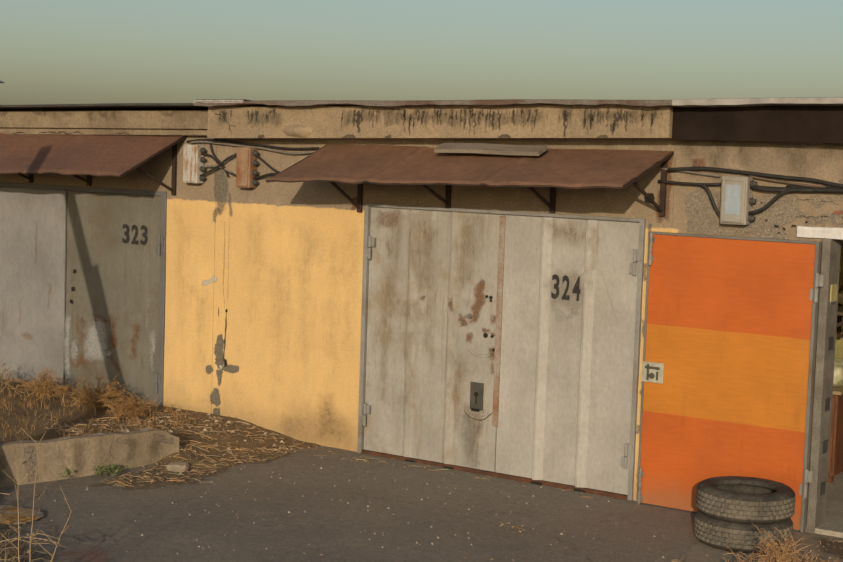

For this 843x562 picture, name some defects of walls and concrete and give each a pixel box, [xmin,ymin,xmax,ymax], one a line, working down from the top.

damp [434,109,538,128]
damp [583,109,662,132]
flaking render [685,187,843,240]
rust [459,281,485,341]
flaking render [206,334,239,415]